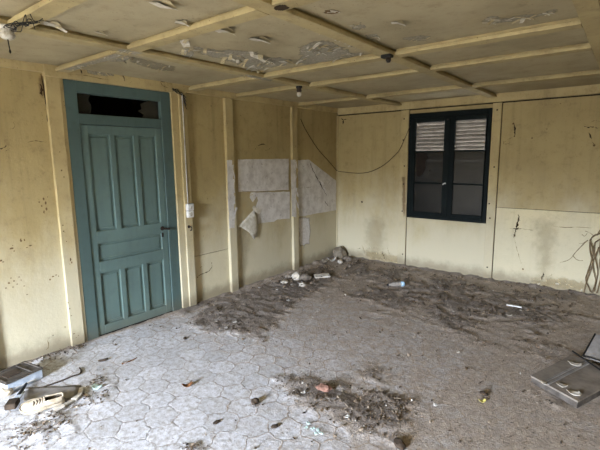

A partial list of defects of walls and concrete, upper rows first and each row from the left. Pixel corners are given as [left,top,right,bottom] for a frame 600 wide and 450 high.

peeling [180,39,362,73]